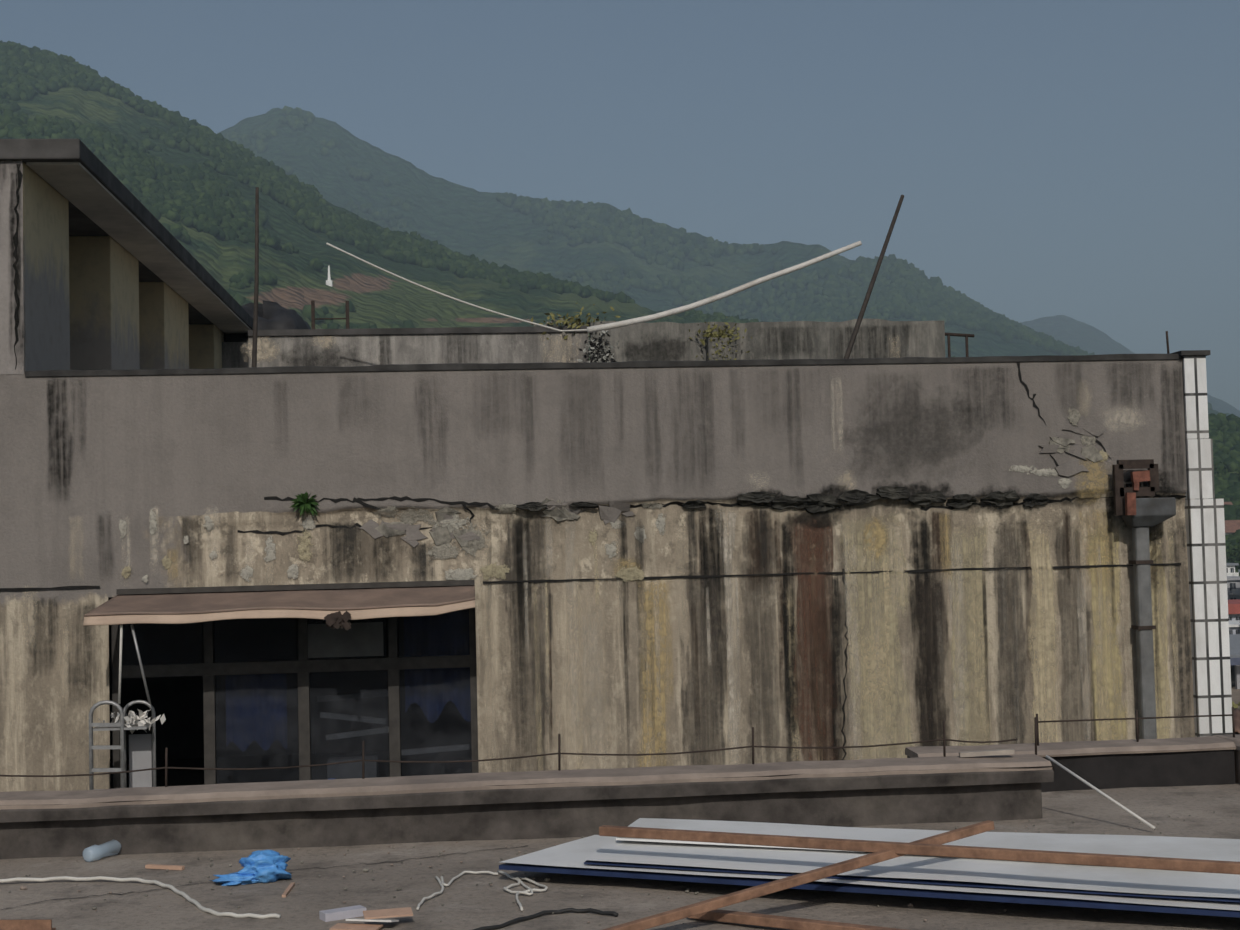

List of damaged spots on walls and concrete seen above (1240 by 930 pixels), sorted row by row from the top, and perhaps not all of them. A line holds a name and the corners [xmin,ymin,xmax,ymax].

water stain [10,172,24,347]
crack [13,164,23,370]
crack [237,496,523,536]
spalling [359,506,510,580]
water stain [505,520,552,750]
crack [559,501,792,509]
water stain [682,485,852,763]
water stain [820,372,1183,760]
crack [920,497,1114,511]
spalling [1009,465,1072,489]
crack [1017,362,1111,459]
water stain [1149,527,1191,739]